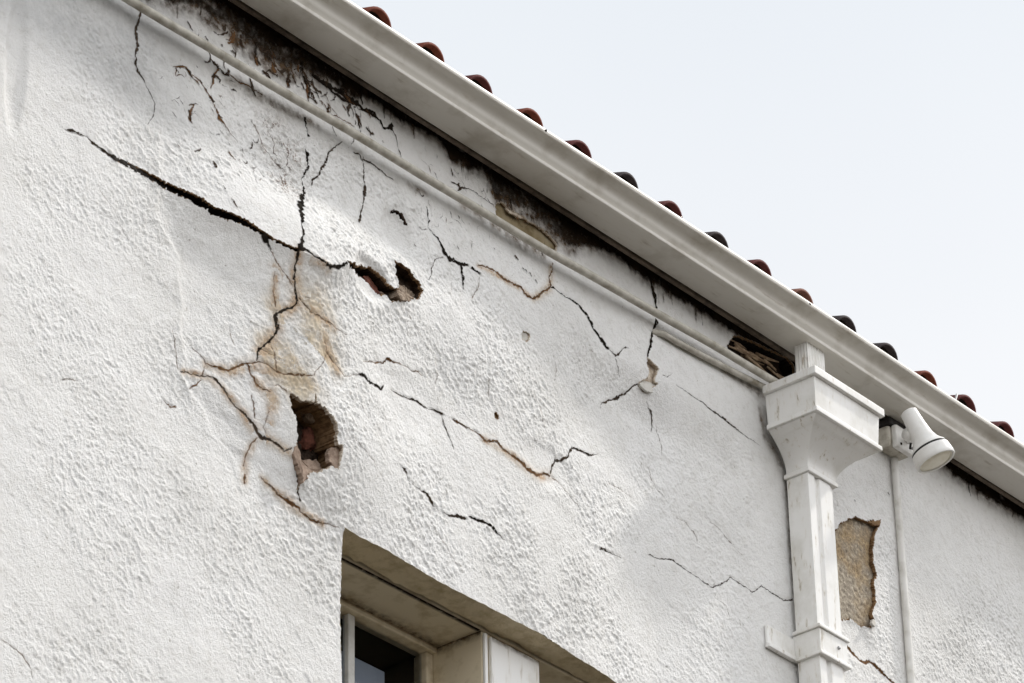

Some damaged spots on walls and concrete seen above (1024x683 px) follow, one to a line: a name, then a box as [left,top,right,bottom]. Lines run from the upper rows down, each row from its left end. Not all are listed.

damp [166,0,796,370]
spalling [482,189,558,255]
crack [67,12,597,527]
spalling [347,260,424,302]
damp [261,339,314,399]
crack [423,209,756,488]
spalling [727,335,795,379]
spalling [289,392,344,490]
crack [400,465,505,540]
damp [946,461,1024,517]
crack [649,554,793,601]
spalling [835,516,881,629]